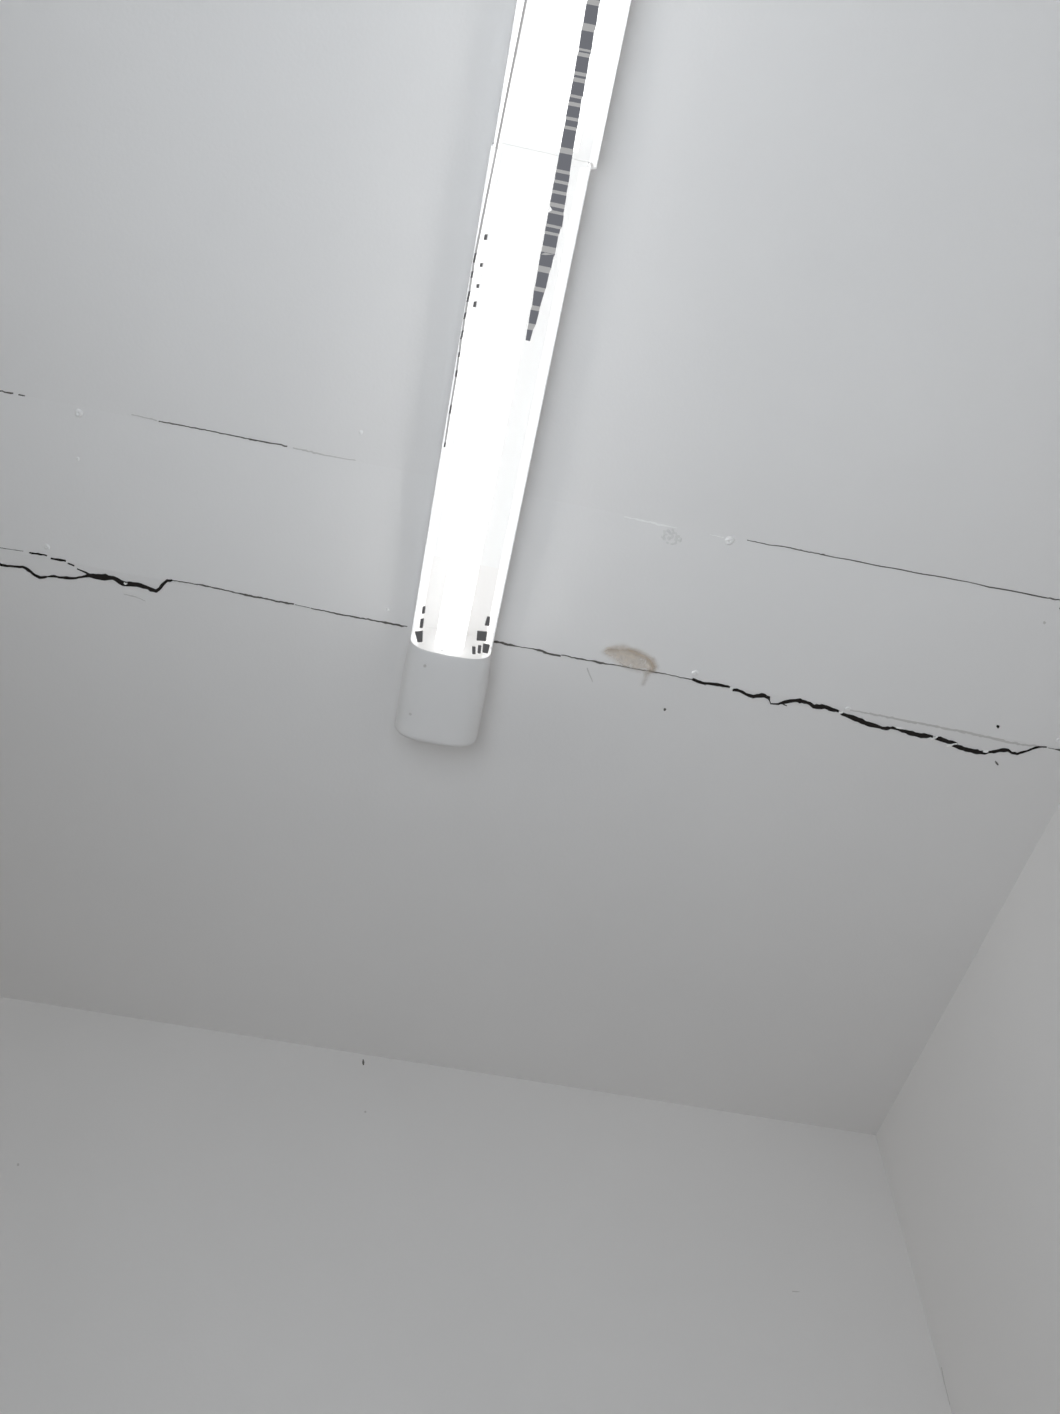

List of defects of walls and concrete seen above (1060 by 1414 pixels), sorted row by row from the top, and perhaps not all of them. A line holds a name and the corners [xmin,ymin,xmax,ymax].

crack [0,548,407,627]
crack [494,641,1060,755]